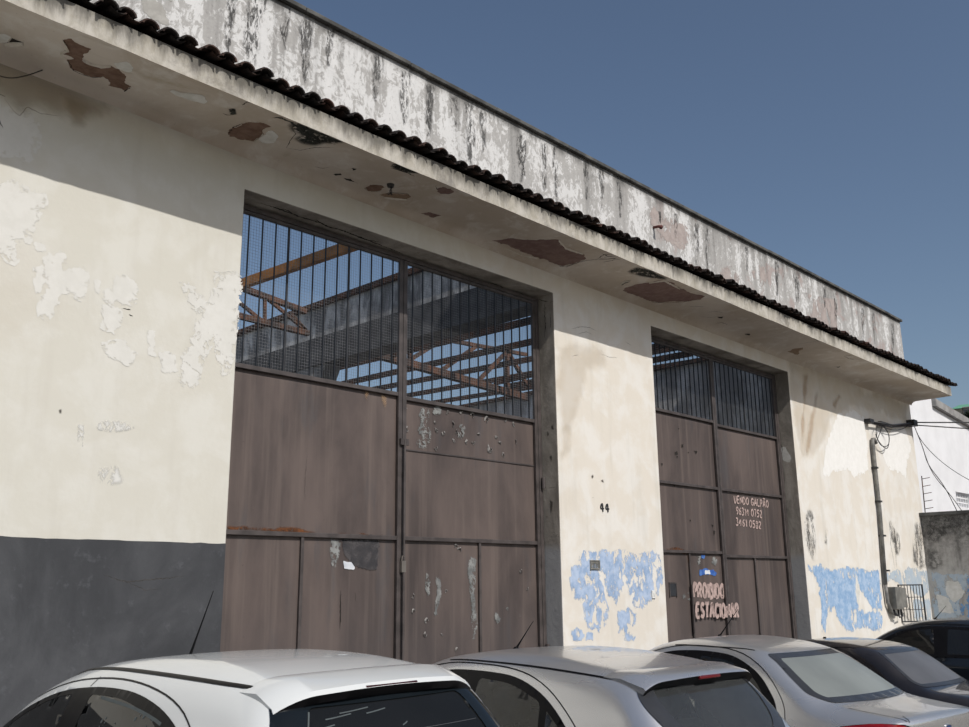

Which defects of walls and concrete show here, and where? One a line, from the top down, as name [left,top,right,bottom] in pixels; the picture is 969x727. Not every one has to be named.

flaking render [60,39,133,92]
water stain [245,0,267,62]
water stain [300,20,313,83]
water stain [279,118,341,151]
water stain [426,86,435,135]
water stain [451,97,485,164]
peeling [0,179,243,388]
flaking render [493,238,586,267]
water stain [629,268,665,279]
flaking render [620,280,705,303]
peeling [569,549,663,641]
peeling [808,563,969,633]